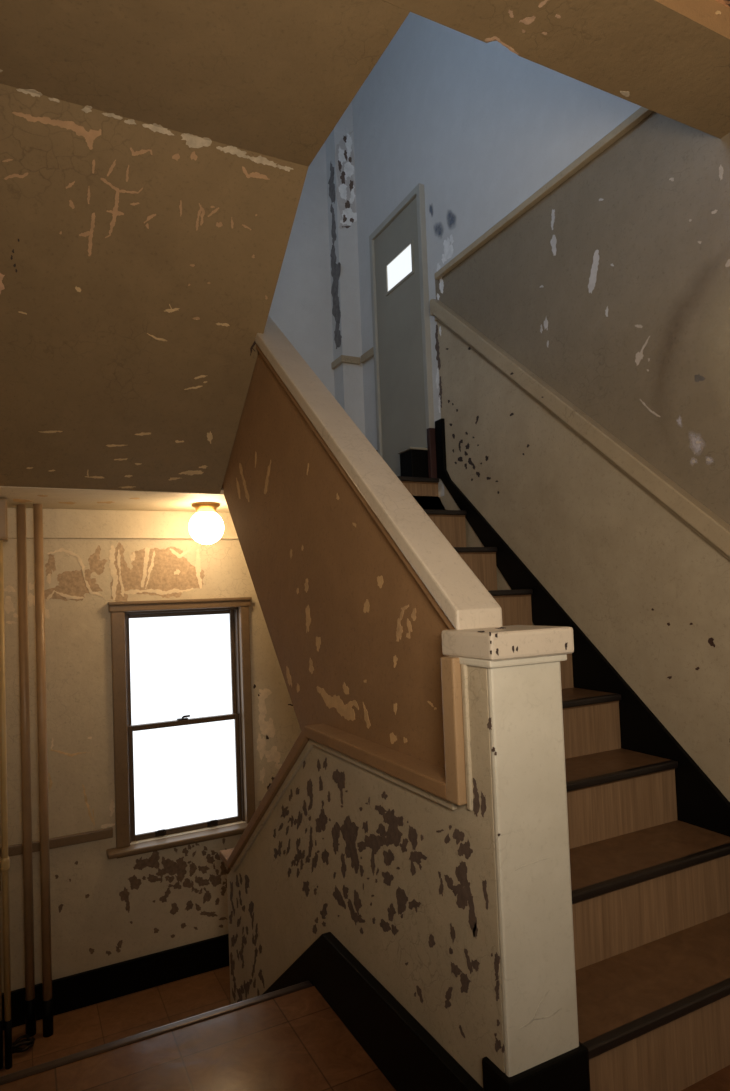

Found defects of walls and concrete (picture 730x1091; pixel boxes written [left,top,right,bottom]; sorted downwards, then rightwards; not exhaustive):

peeling [12,112,153,256]
flaking render [81,105,294,180]
peeling [435,325,499,494]
flaking render [4,542,205,624]
peeling [253,684,282,790]
peeling [316,682,371,729]
peeling [119,838,265,1003]
peeling [273,758,427,936]
peeling [436,825,489,939]
peeling [445,923,480,1009]
peeling [473,778,487,817]
peeling [491,952,500,1001]